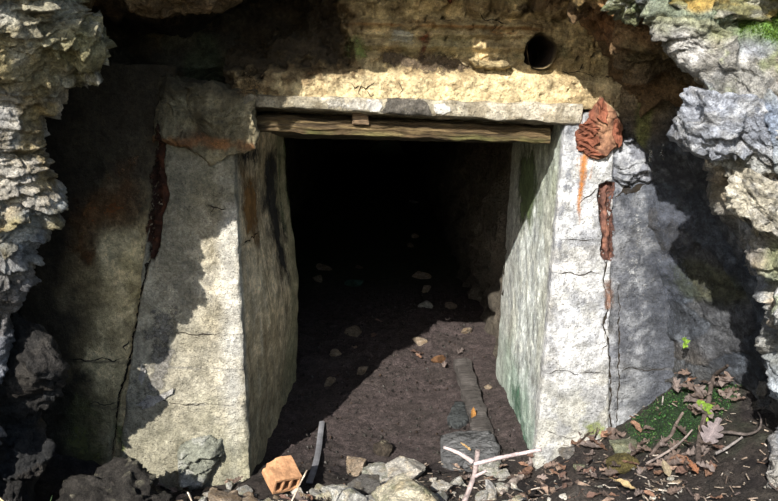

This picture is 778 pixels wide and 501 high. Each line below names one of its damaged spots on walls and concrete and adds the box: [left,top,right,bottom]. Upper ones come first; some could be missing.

water stain [238,148,290,283]
rust [575,98,623,210]
crack [64,260,151,452]
crack [548,261,667,427]